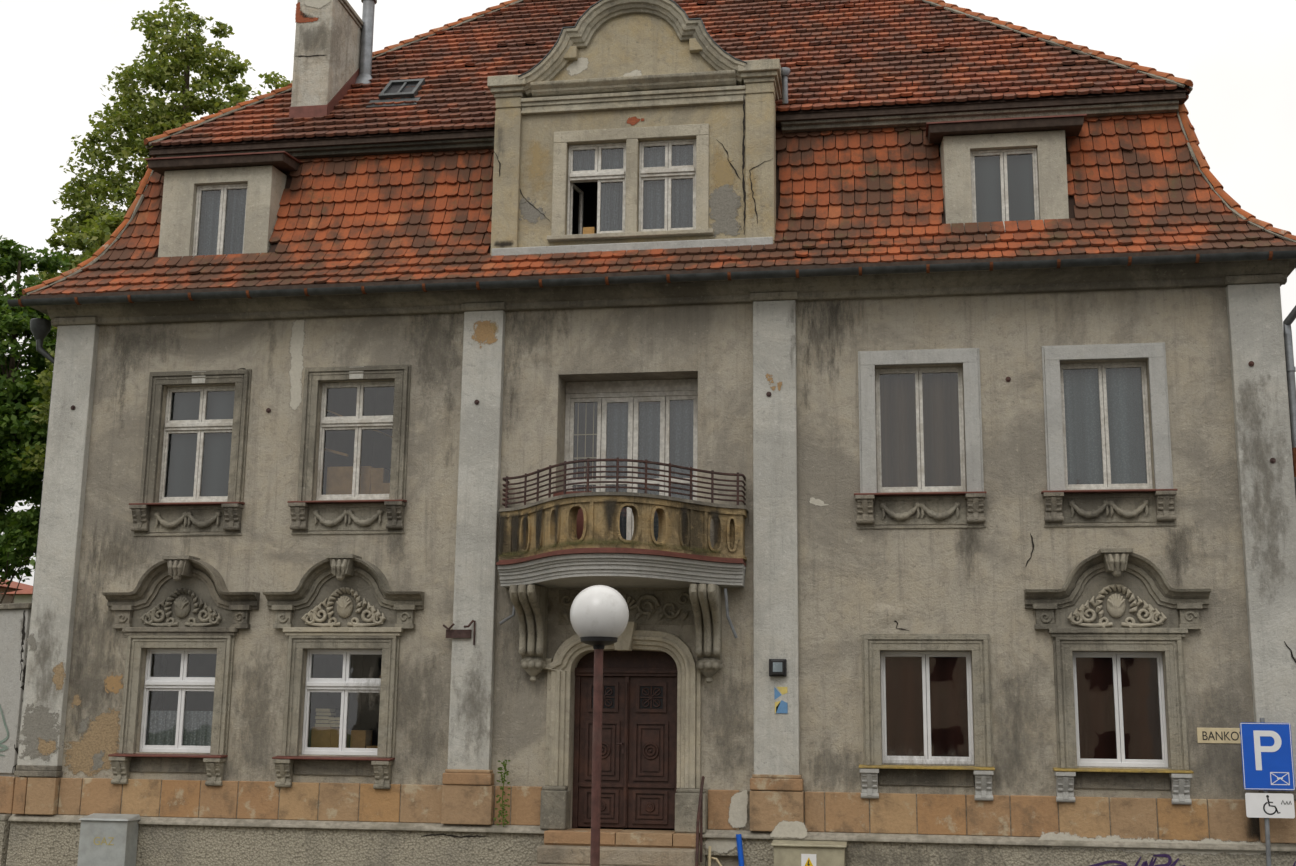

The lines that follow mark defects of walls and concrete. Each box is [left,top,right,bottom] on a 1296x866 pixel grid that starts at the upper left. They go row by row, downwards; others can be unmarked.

crack [717,93,773,235]
flaking render [471,320,498,348]
flaking render [17,662,123,777]